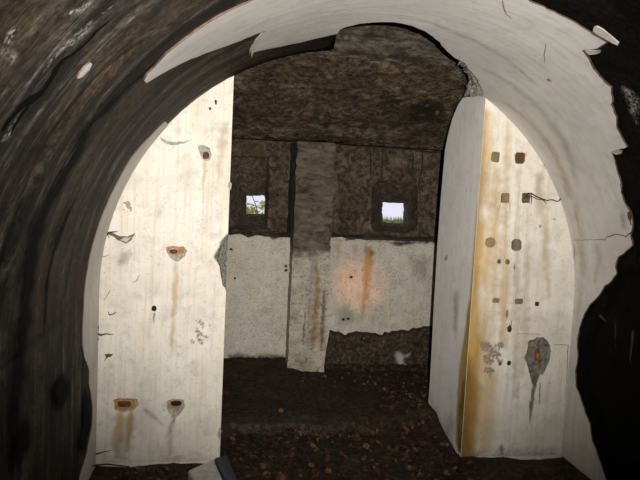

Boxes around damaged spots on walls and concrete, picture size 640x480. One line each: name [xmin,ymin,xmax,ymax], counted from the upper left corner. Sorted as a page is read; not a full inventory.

corrosion [115,399,136,442]
peeling [78,121,190,480]
corrosion [364,248,372,300]
peeling [143,0,634,480]
corrosion [457,145,485,457]